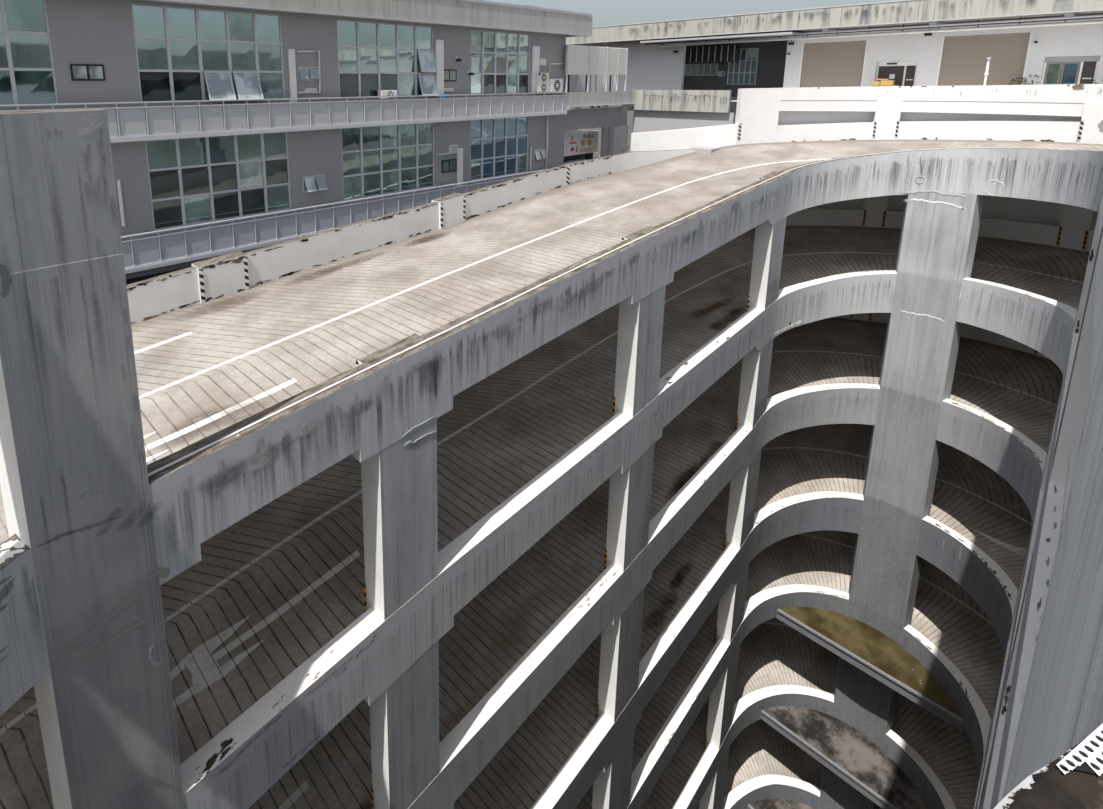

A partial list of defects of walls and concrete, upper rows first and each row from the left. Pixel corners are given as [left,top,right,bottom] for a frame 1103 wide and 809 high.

water stain [897,190,969,211]
peeling [196,738,236,783]